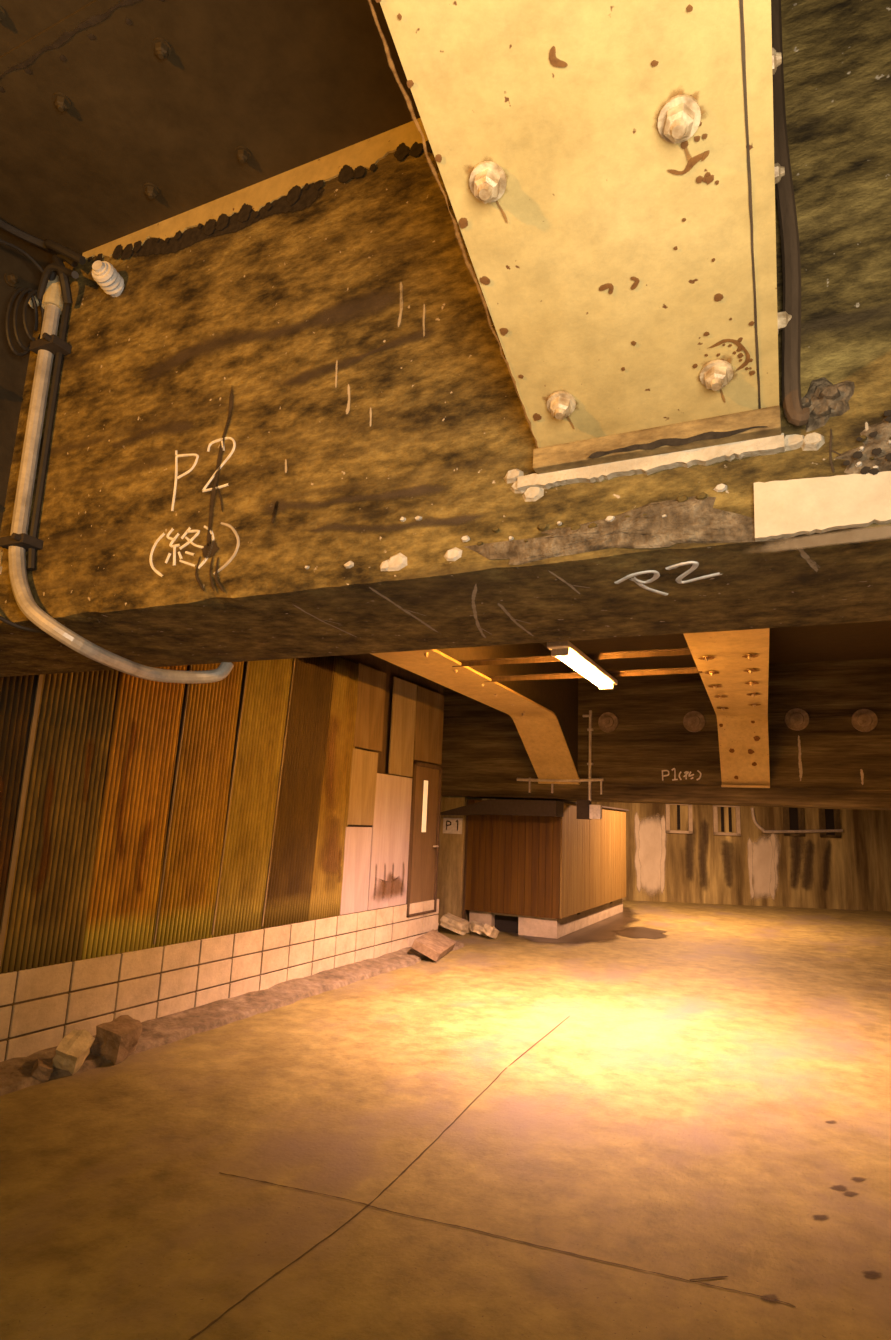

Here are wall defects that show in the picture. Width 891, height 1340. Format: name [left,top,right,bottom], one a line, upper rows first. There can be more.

peeling [504,377,855,502]
spalling [834,410,891,475]
spalling [444,484,795,565]
spalling [380,553,407,571]
damp [635,813,666,892]
damp [687,822,731,886]
damp [748,833,830,899]